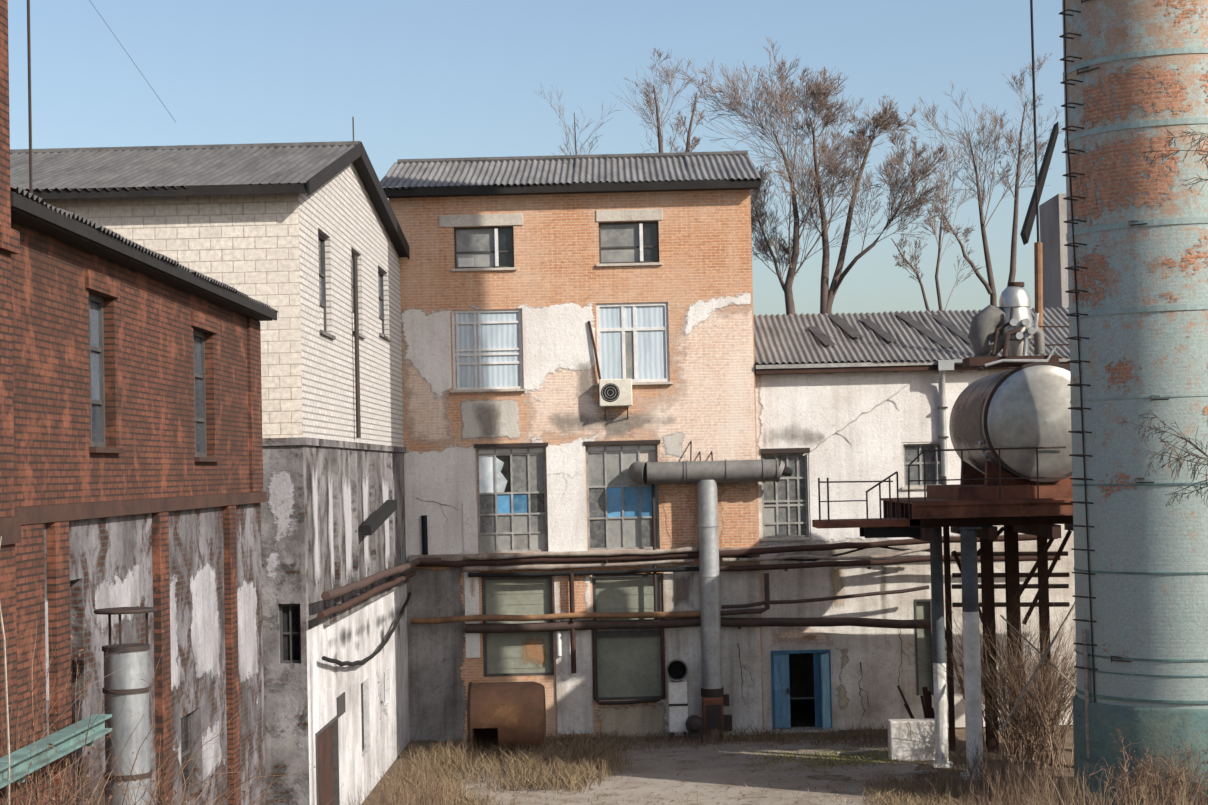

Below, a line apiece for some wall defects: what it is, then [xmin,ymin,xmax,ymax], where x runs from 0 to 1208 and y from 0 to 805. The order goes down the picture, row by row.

peeling [1155,0,1208,33]
peeling [1067,62,1208,311]
damp [555,415,651,434]
peeling [518,292,990,552]
crack [803,371,923,456]
peeling [95,559,146,634]
peeling [170,562,221,691]
peeling [237,469,298,685]
damp [312,473,396,577]
spalling [557,575,588,613]
peeling [597,563,703,738]
peeling [719,564,849,735]